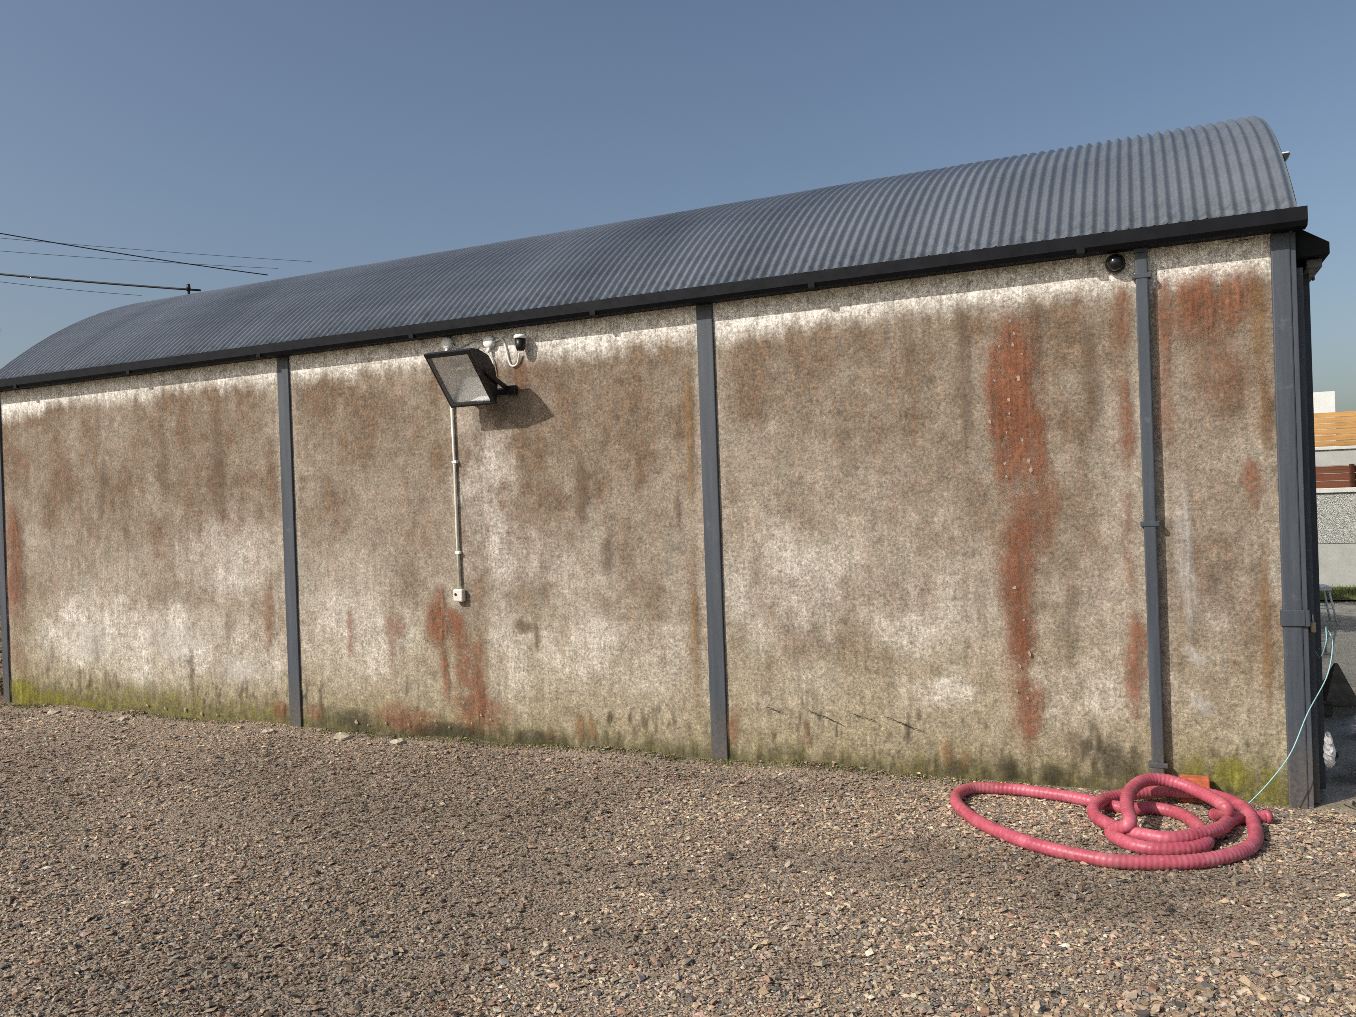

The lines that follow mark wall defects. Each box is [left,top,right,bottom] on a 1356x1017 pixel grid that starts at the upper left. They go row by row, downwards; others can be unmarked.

corrosion [1158,272,1249,348]
corrosion [986,323,1044,473]
corrosion [1126,619,1145,699]